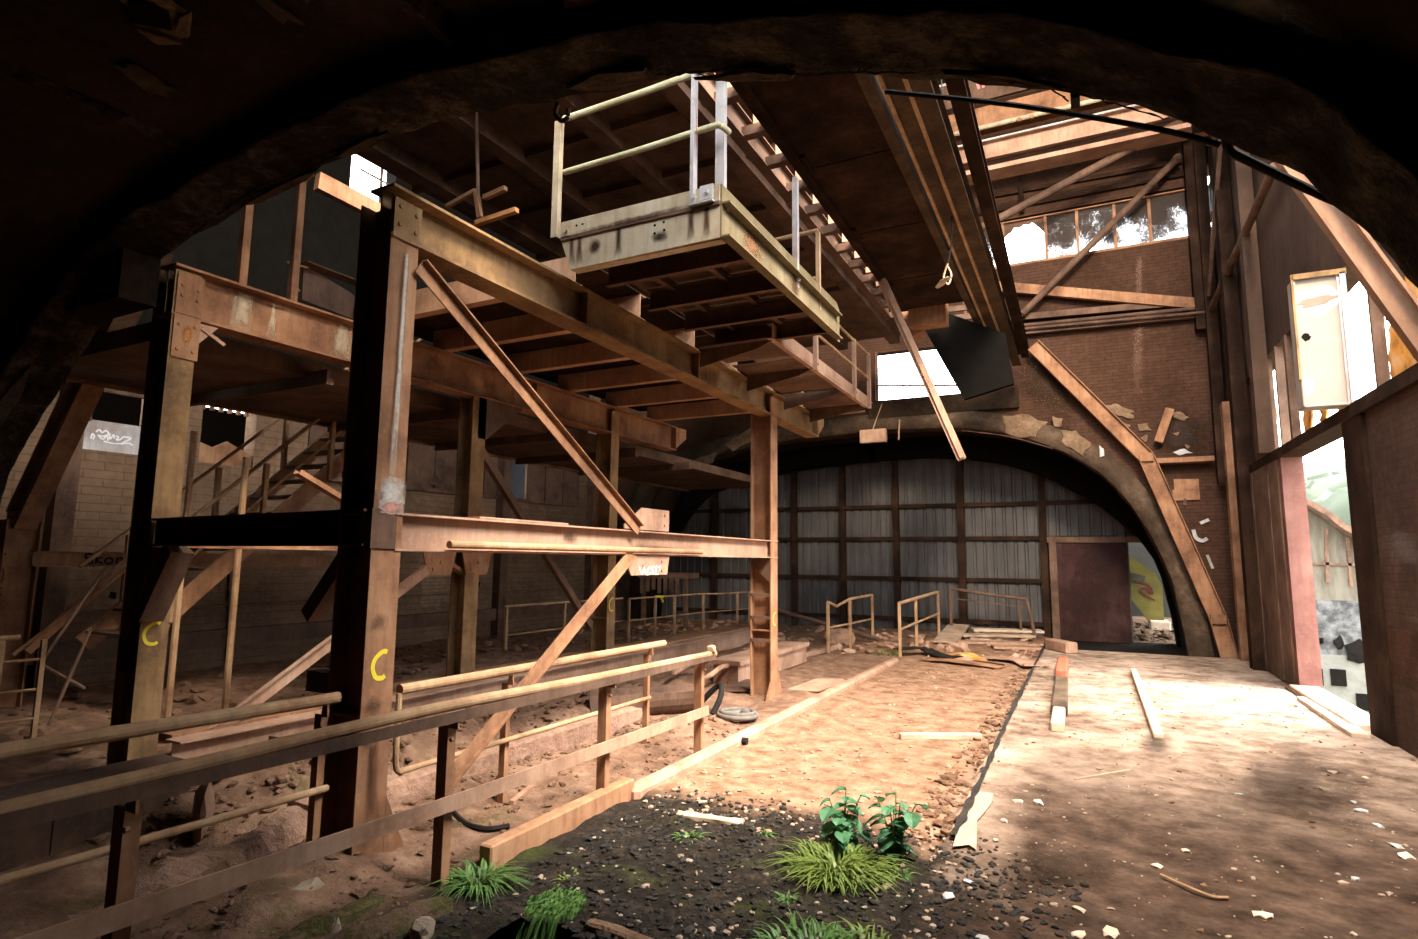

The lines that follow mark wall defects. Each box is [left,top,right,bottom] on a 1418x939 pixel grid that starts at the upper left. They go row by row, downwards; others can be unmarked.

peeling [1002,414,1104,457]